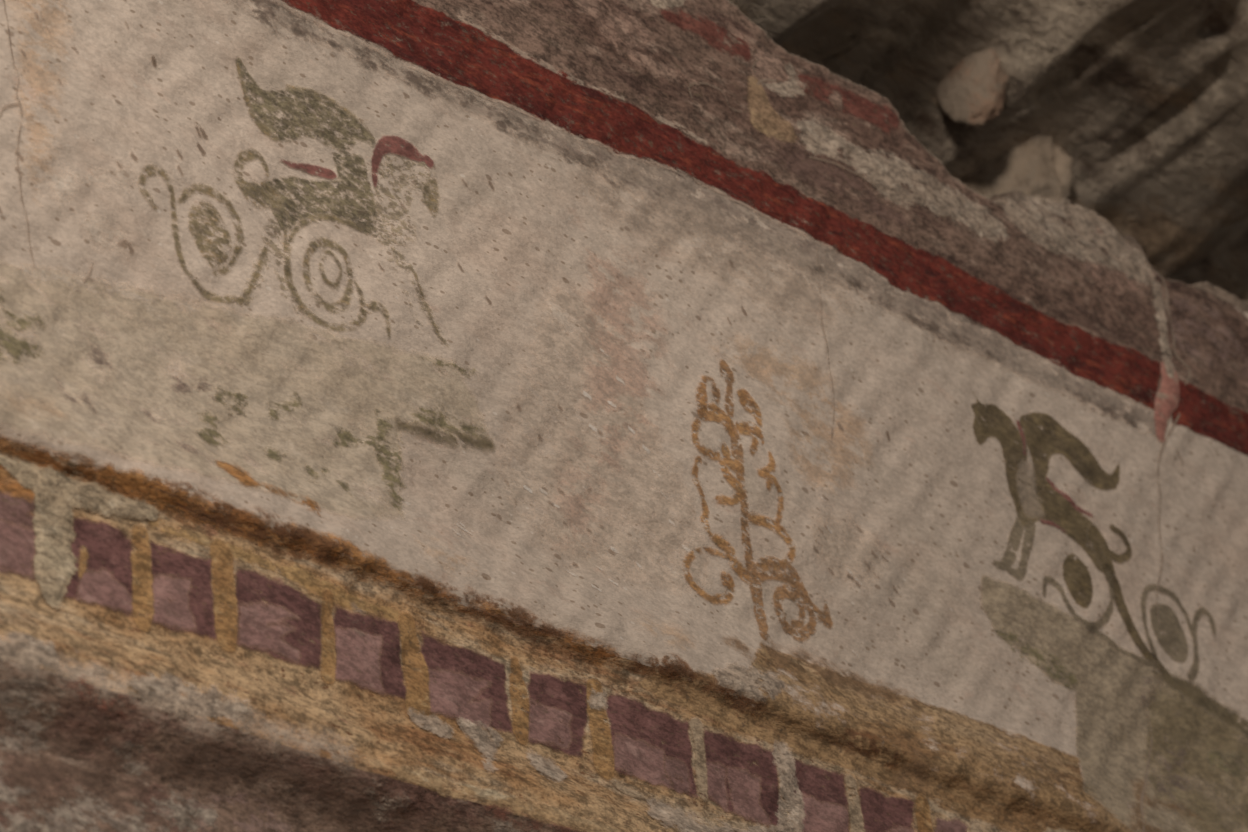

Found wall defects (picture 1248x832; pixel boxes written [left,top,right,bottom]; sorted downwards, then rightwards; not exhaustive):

crack [0,96,34,260]
peeling [571,0,699,88]
peeling [726,21,1155,295]
crack [1152,277,1191,624]